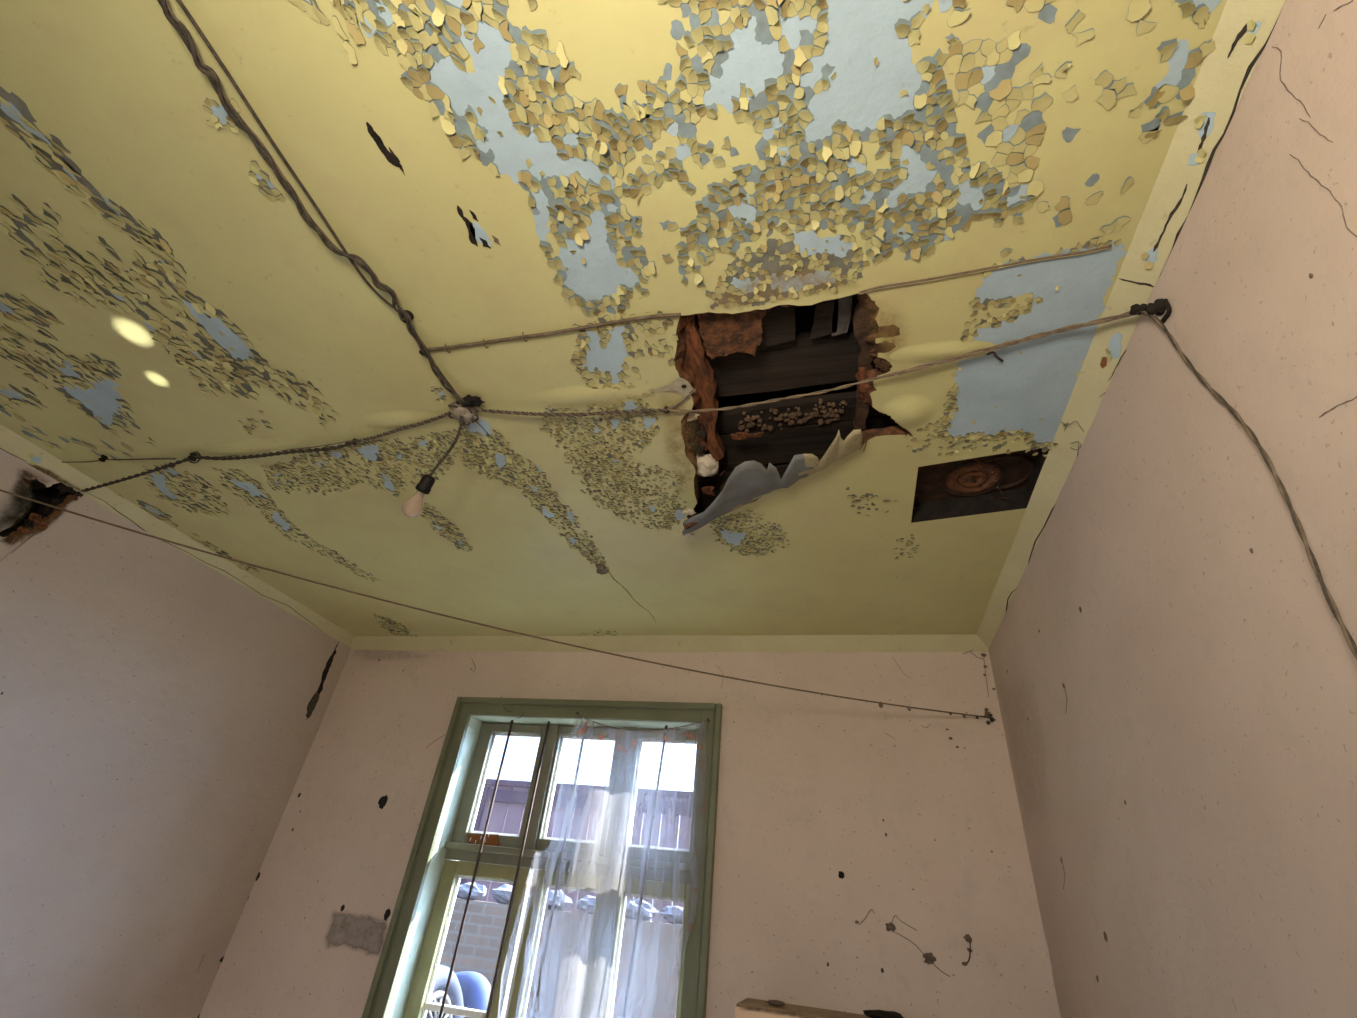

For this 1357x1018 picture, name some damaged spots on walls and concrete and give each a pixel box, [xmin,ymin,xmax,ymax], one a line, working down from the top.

peeling [0,86,610,582]
peeling [289,0,1104,531]
peeling [905,216,1158,457]
peeling [1095,0,1222,166]
crack [1119,0,1332,287]
crack [1289,154,1357,237]
crack [1318,396,1357,418]
peeling [709,510,790,558]